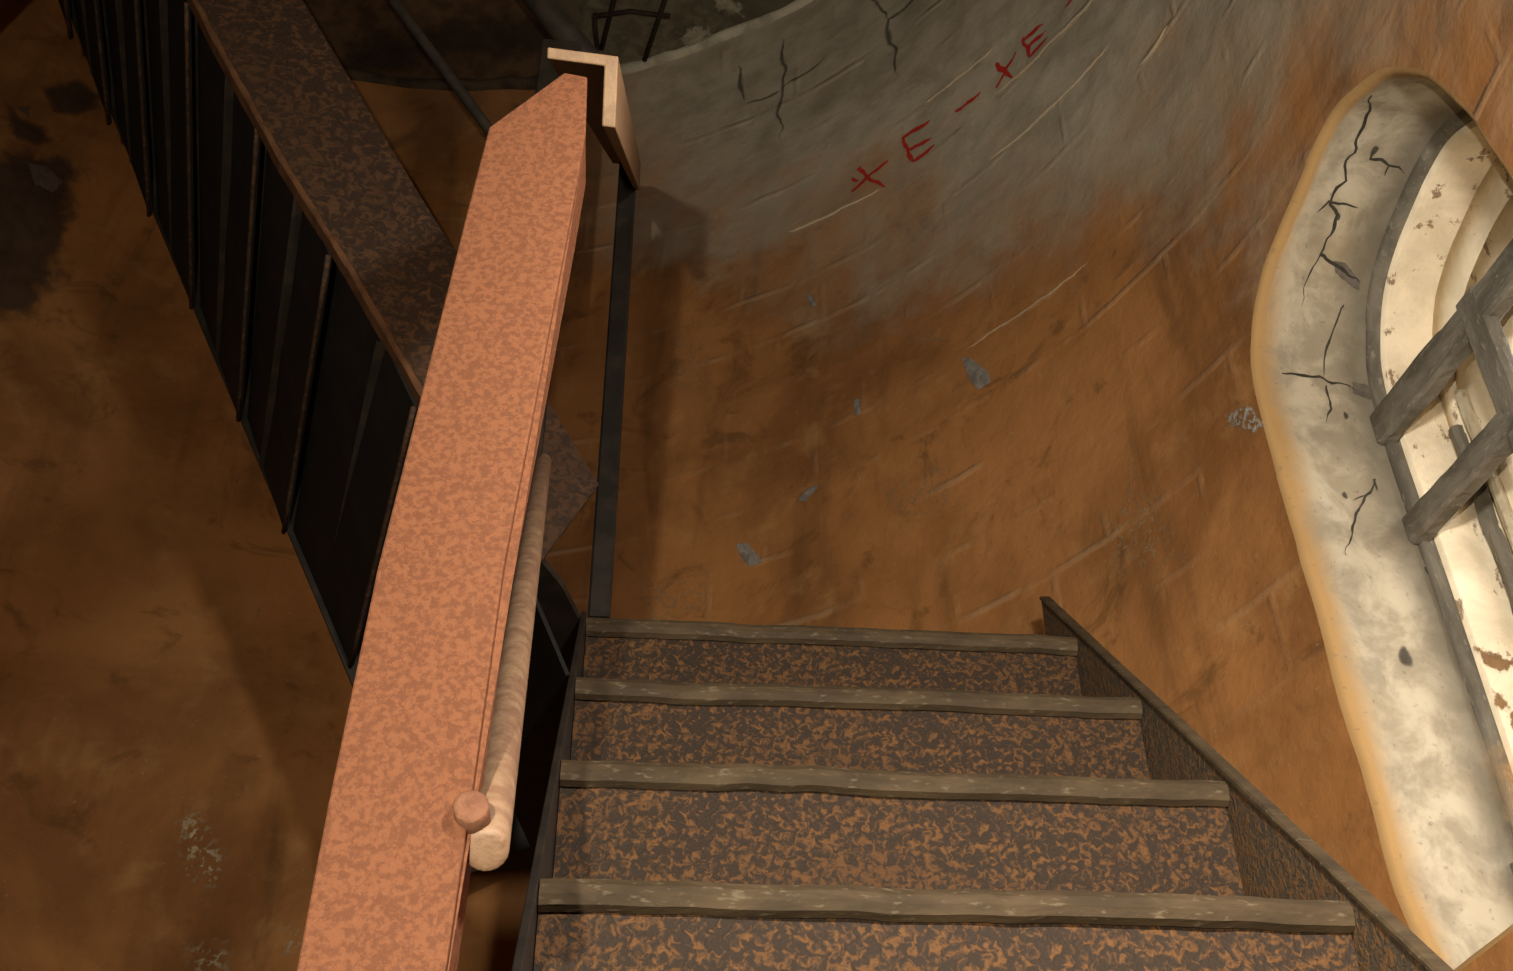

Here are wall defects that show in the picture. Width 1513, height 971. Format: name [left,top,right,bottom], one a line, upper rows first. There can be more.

crack [872,0,913,71]
crack [739,46,824,130]
crack [1282,95,1405,422]
crack [1345,479,1378,555]
peeling [1473,646,1513,671]
peeling [1494,692,1513,727]